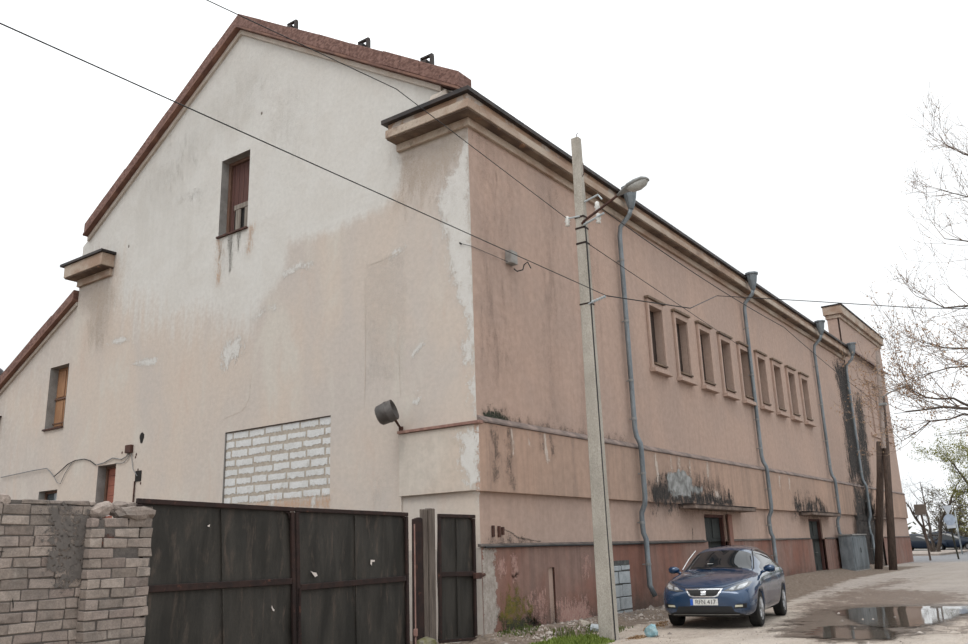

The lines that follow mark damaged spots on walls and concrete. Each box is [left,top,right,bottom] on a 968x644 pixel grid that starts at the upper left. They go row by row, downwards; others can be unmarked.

peeling [436,139,480,515]